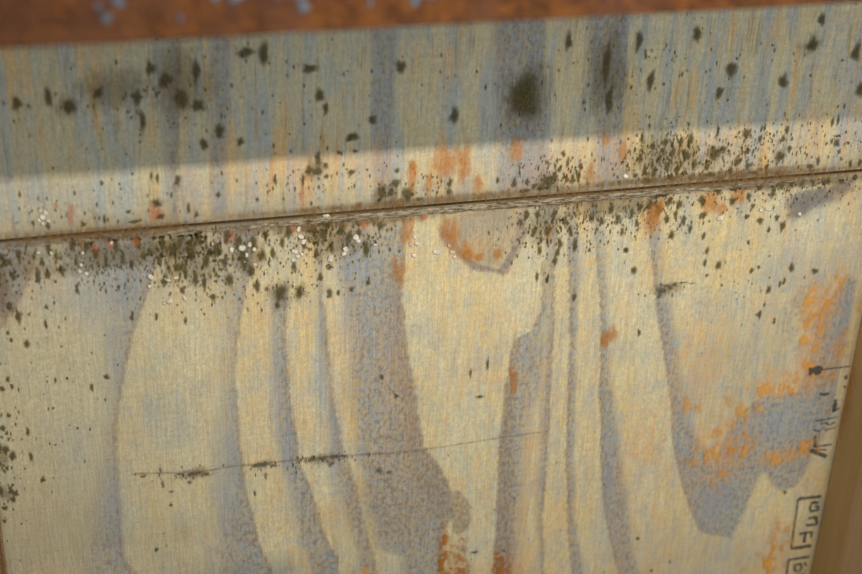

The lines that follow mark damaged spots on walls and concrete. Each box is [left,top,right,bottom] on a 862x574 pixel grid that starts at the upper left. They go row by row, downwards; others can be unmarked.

water stain [45,90,75,113]
water stain [117,56,228,150]
water stain [240,45,270,64]
water stain [512,77,543,116]
water stain [588,45,619,112]
water stain [0,104,862,329]
corrosion [722,288,835,434]
water stain [0,407,37,574]
corrosion [439,534,469,574]